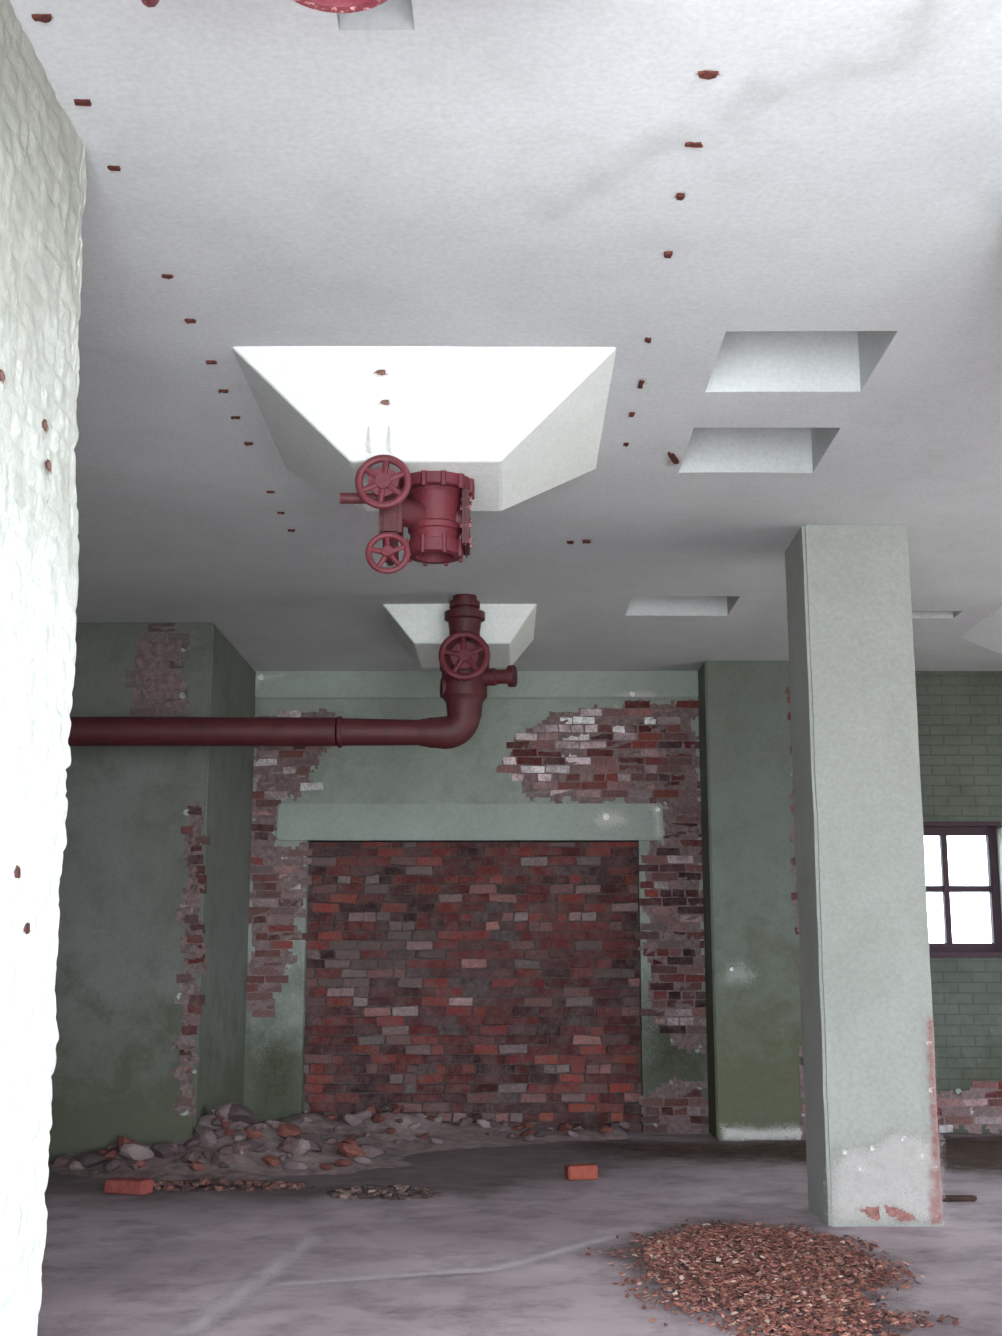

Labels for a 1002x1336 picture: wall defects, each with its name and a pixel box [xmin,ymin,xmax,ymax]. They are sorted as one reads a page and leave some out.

flaking render [257,708,345,718]
spalling [170,801,210,1116]
flaking render [246,746,331,1017]
flaking render [496,689,758,1055]
peeling [822,1015,1002,1227]